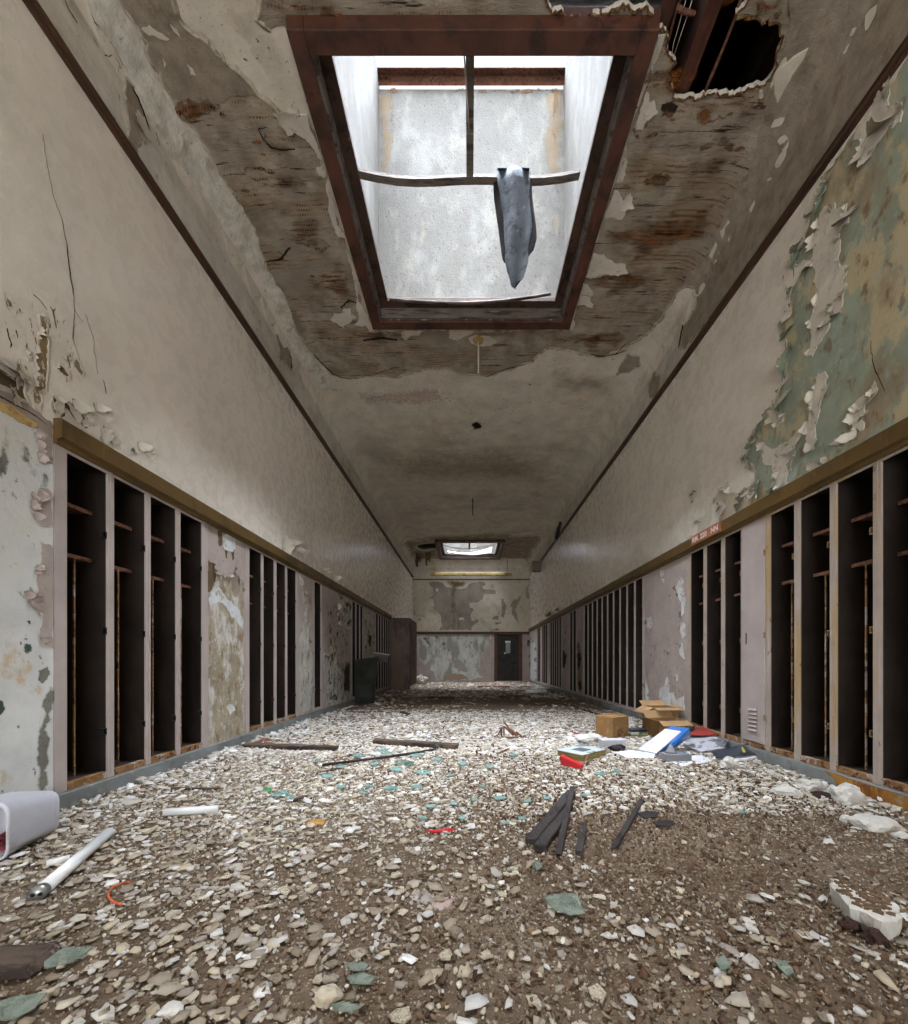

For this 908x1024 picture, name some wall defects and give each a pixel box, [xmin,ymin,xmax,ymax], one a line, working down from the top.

crack [6,139,107,394]
spalling [119,0,908,545]
peeling [0,311,159,464]
peeling [30,487,54,527]
peeling [24,542,53,649]
peeling [208,531,246,745]
peeling [643,673,686,718]
peeling [658,568,687,661]